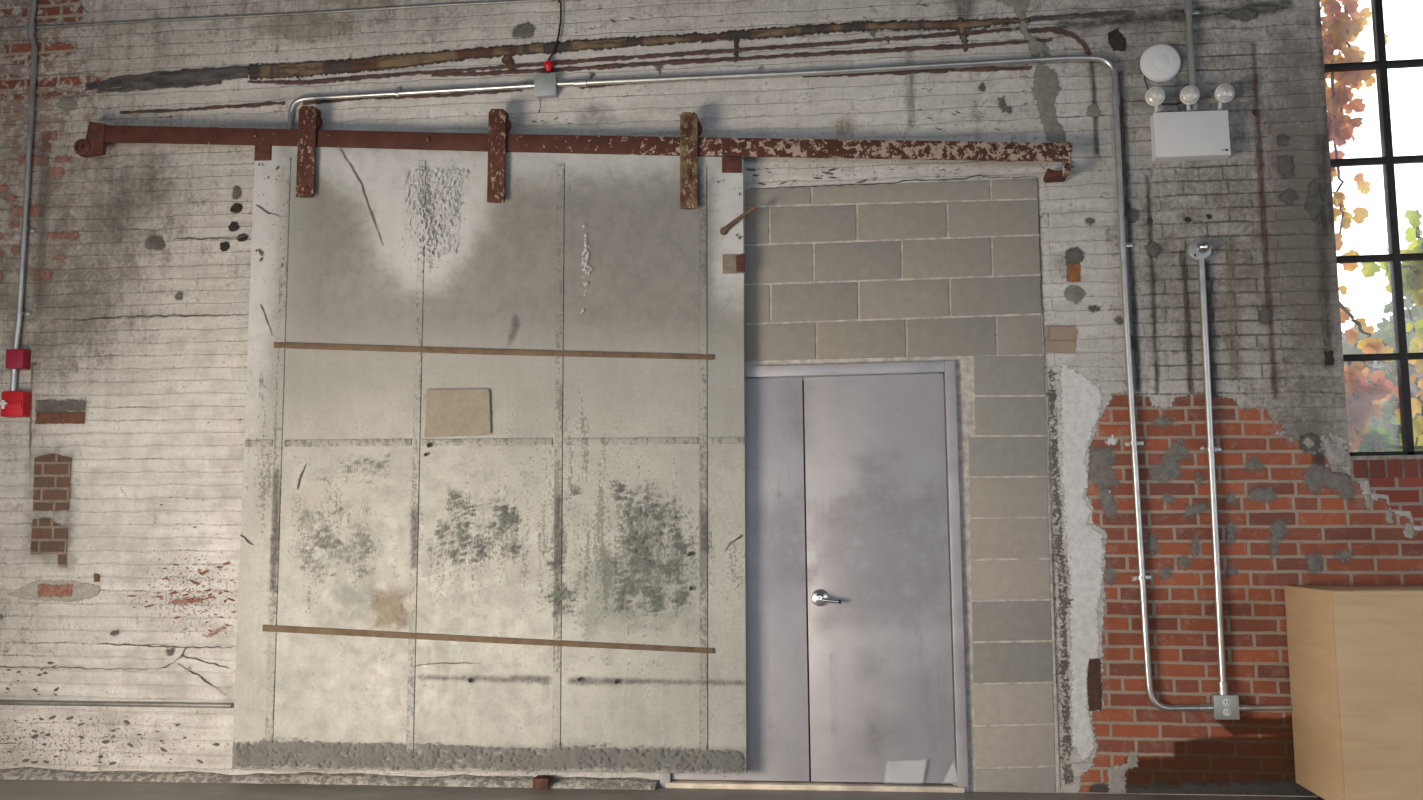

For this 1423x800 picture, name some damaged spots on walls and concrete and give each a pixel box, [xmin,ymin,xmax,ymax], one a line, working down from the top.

flaking render [18,131,72,179]
flaking render [0,183,43,283]
flaking render [30,454,73,598]
flaking render [1045,325,1423,793]